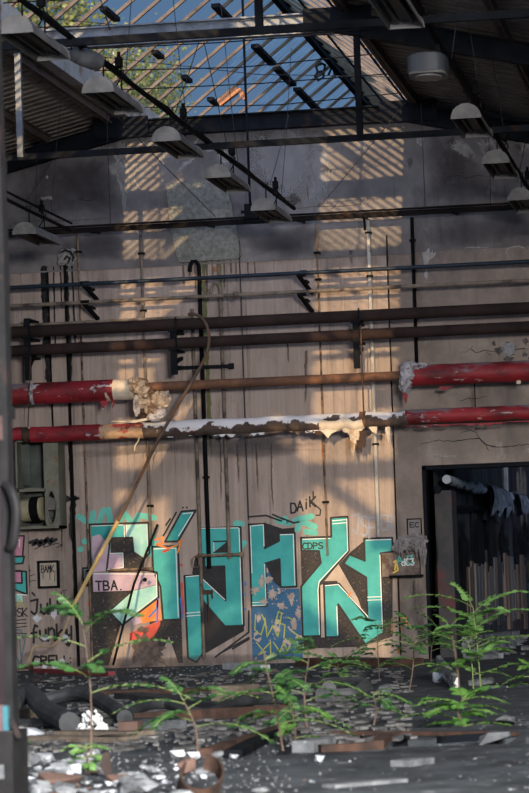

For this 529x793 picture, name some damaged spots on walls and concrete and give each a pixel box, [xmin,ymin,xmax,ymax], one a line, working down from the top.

crack [422,430,529,449]